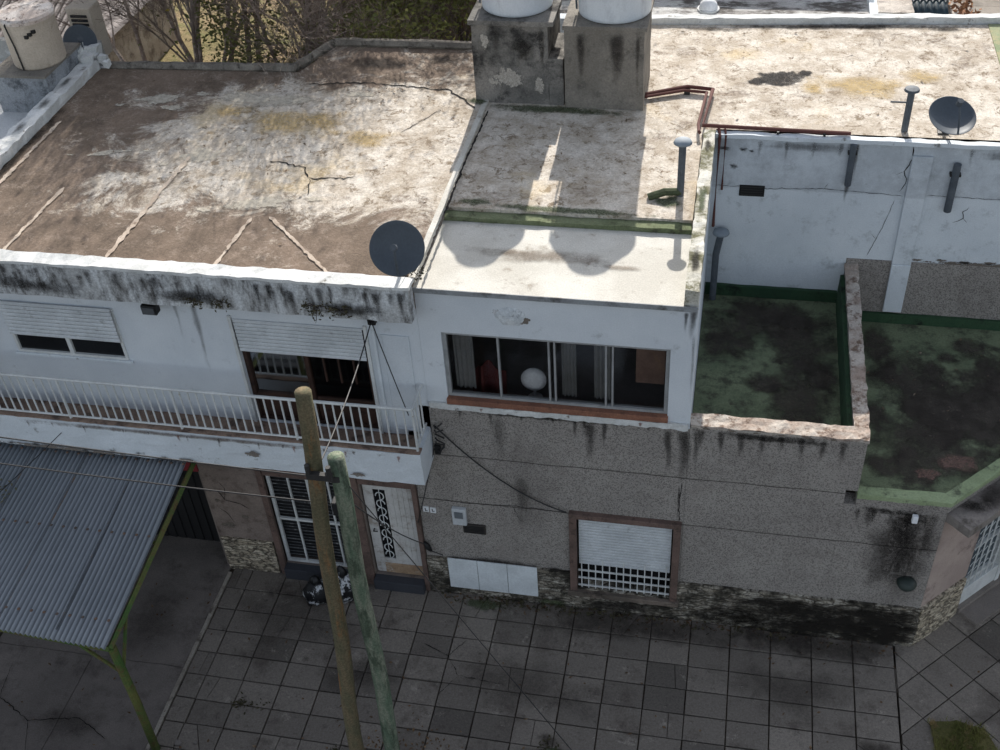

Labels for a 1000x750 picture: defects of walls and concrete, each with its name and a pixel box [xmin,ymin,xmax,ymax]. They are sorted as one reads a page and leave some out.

damp [489,68,524,88]
crack [270,161,355,194]
crack [312,82,488,274]
damp [0,266,63,292]
damp [140,278,213,305]
damp [315,289,378,316]
damp [685,297,838,424]
damp [863,329,1000,486]
damp [498,414,606,440]
damp [719,433,826,452]
damp [691,598,917,659]
crack [0,667,105,749]